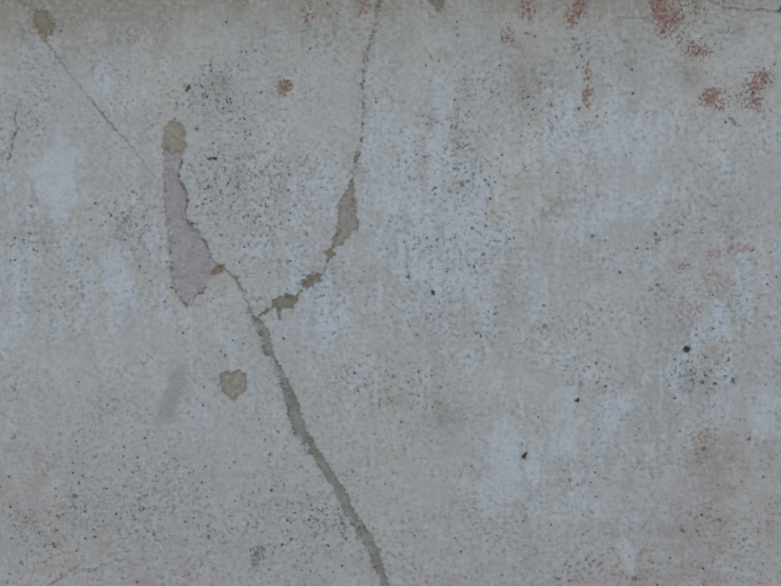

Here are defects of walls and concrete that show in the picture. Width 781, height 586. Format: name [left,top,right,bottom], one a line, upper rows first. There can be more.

crack [6,103,19,166]
crack [47,38,160,181]
crack [349,0,383,188]
rust [499,0,538,49]
rust [561,0,595,113]
rust [647,0,715,62]
rust [696,64,777,114]
crack [708,0,778,34]
peeling [162,149,225,309]
spalling [330,184,360,249]
crack [224,232,391,586]
crack [45,558,124,586]